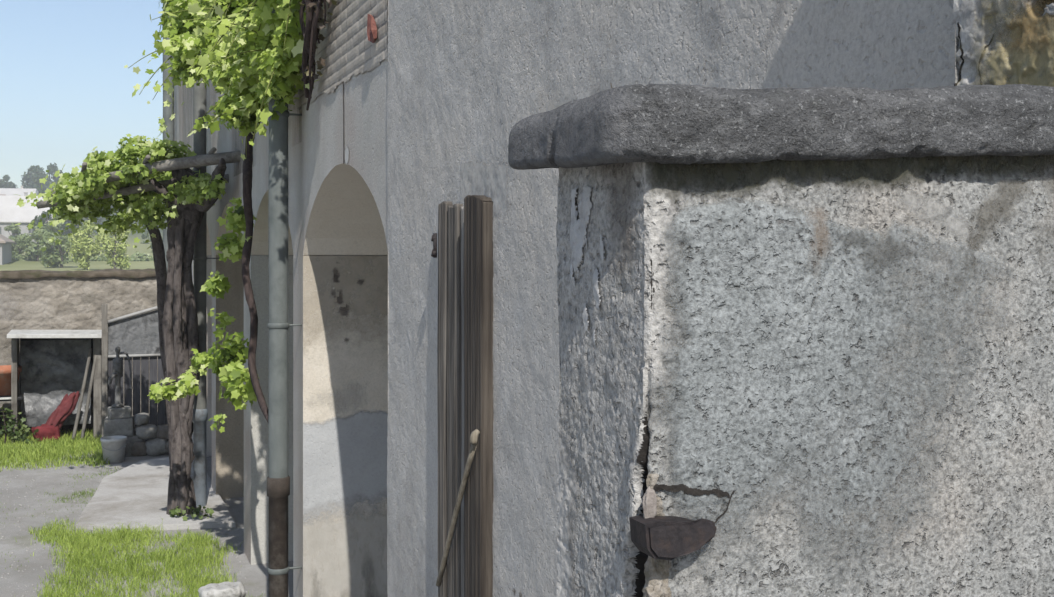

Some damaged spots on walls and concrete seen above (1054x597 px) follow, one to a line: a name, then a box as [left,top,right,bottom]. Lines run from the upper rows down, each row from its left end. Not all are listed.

crack [954,22,994,86]
water stain [303,256,388,333]
crack [648,249,656,309]
crack [636,388,735,524]
water stain [303,514,388,597]
crack [631,551,648,597]